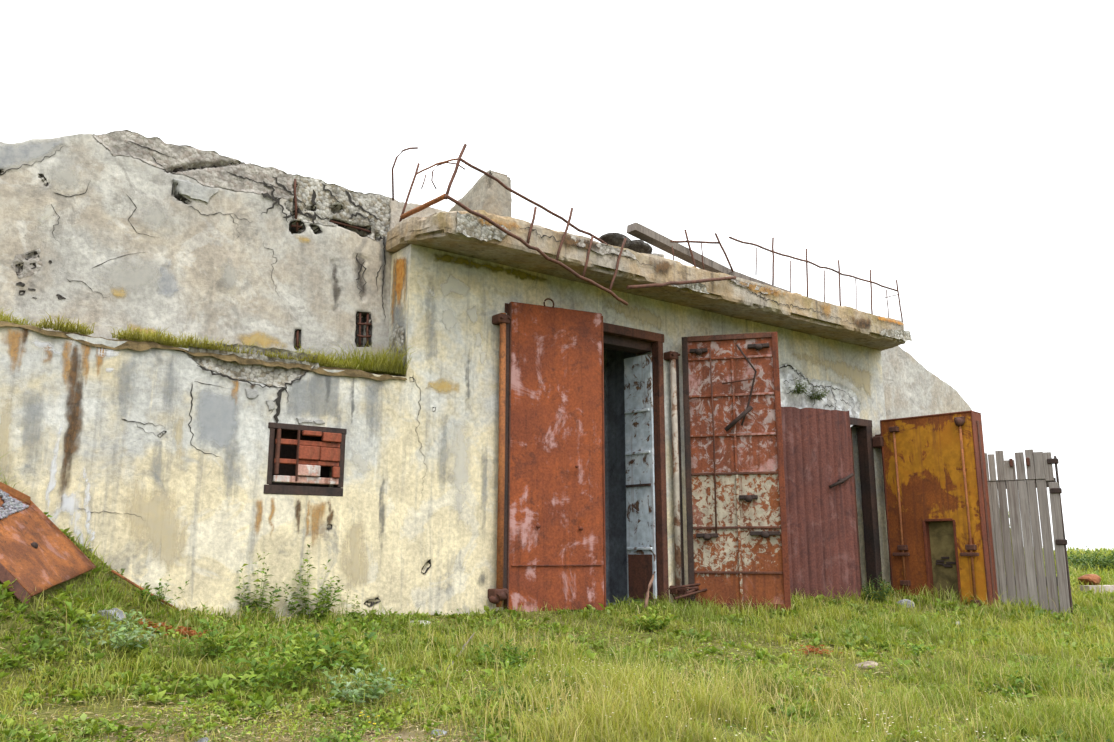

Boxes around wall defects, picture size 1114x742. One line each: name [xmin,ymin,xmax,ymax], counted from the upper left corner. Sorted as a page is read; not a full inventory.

peeling [0,141,64,186]
spalling [91,130,391,240]
spalling [11,248,52,299]
spalling [355,253,372,347]
rust [391,259,406,322]
spalling [456,211,512,241]
rust [561,234,600,249]
spalling [571,236,636,259]
rust [656,261,673,274]
spalling [671,283,709,294]
spalling [388,324,414,382]